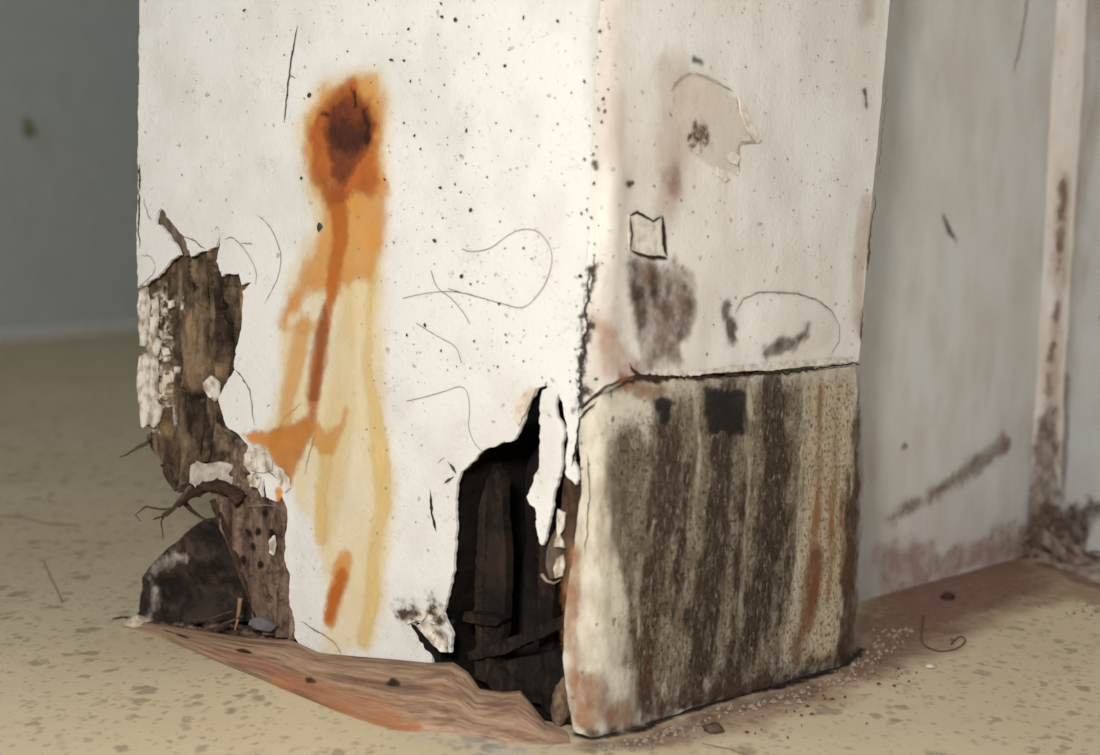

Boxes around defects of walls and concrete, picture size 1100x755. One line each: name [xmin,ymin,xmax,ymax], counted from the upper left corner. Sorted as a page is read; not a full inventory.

peeling [136,287,175,428]
peeling [189,448,291,493]
rust [247,79,387,542]
rust [325,553,349,626]
rust [360,364,390,645]
spalling [395,386,582,726]
peeling [627,210,667,260]
mould [632,260,695,363]
crack [571,259,864,549]
damp [764,326,808,356]
damp [608,374,1100,722]
crack [867,80,888,269]